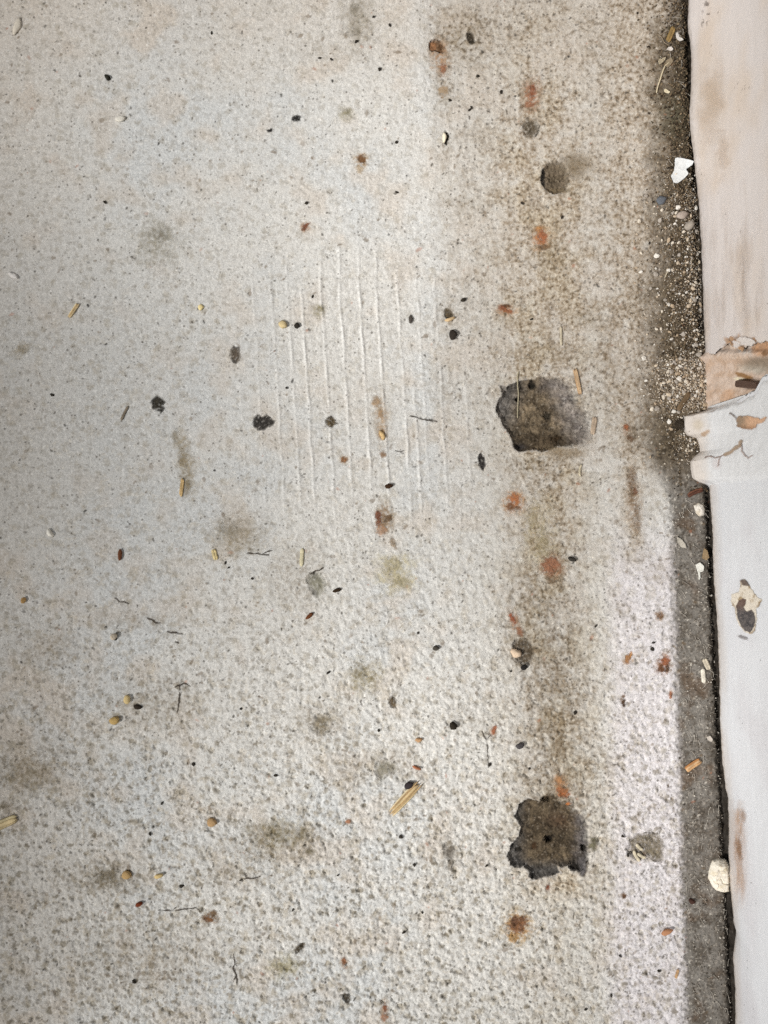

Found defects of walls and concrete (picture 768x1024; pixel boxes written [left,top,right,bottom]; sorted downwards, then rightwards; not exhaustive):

peeling [726,336,761,352]
spalling [496,377,586,455]
peeling [729,413,766,430]
spalling [505,788,598,879]